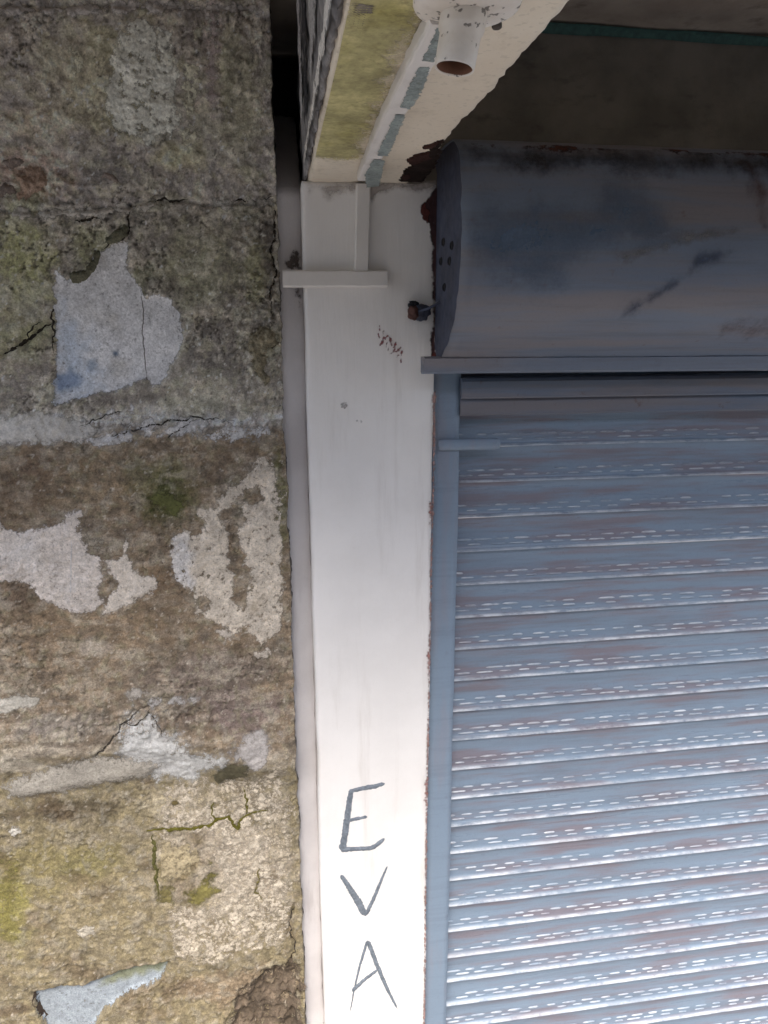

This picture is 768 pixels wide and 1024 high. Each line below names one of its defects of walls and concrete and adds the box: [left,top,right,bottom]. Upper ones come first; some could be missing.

crack [3,303,56,356]
crack [75,215,100,223]
crack [102,213,130,250]
spalling [51,224,184,406]
crack [155,195,188,203]
rust [421,188,437,356]
crack [77,411,234,438]
flaking render [0,510,157,615]
flaking render [169,456,287,659]
flaking render [32,758,307,1024]
crack [146,788,267,897]